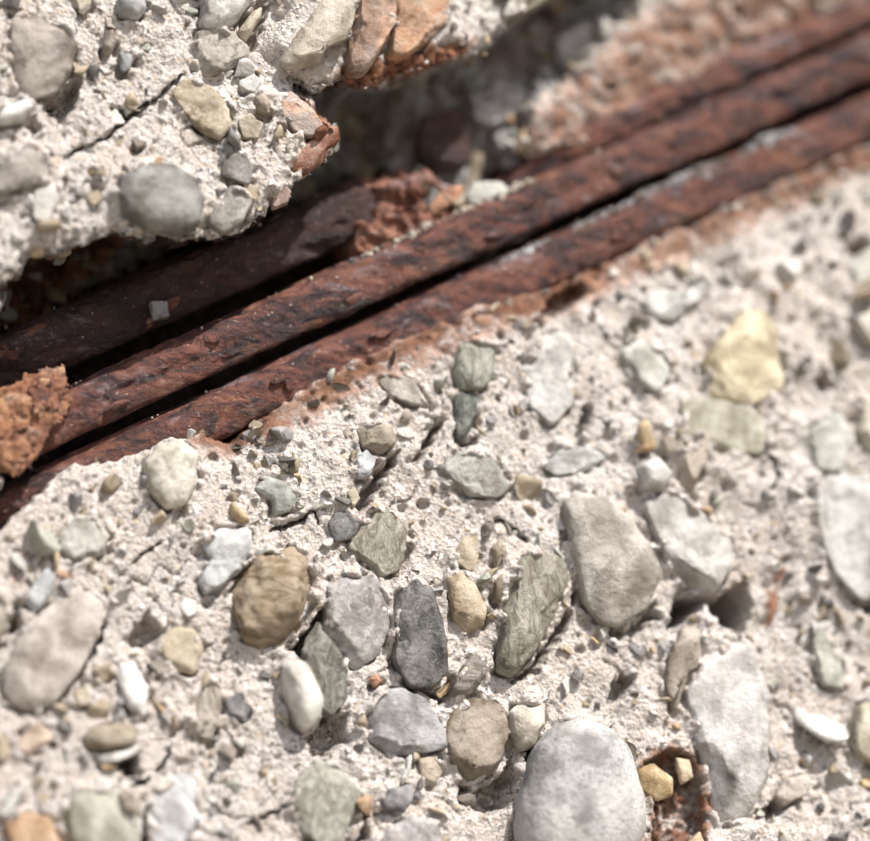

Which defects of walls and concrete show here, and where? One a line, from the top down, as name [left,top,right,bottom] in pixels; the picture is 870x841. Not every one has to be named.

rust [298,92,334,141]
rust [325,36,477,90]
rust [526,0,842,151]
rust [0,234,132,329]
spalling [0,0,870,531]
rust [190,145,870,459]
rust [0,364,73,477]